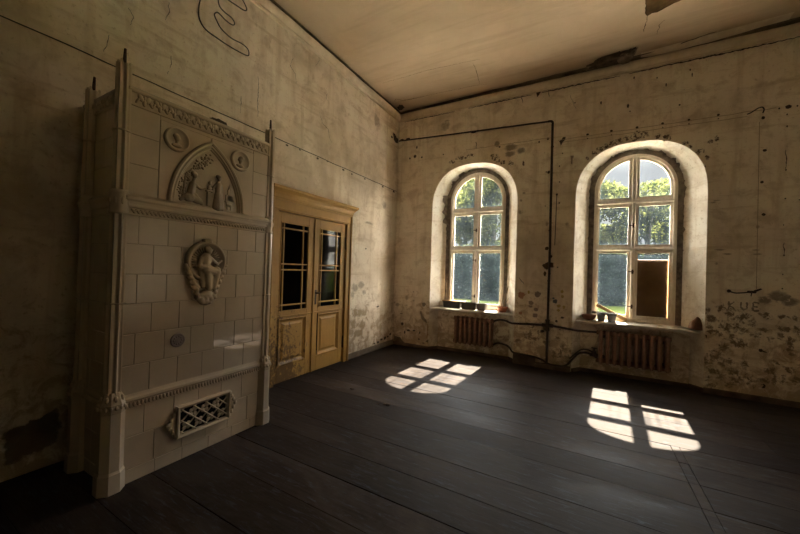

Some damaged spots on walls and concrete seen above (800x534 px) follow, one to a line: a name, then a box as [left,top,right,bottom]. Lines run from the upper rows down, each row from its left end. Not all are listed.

spalling [645,0,681,16]
spalling [584,47,638,71]
peeling [349,306,421,347]
peeling [704,300,800,391]